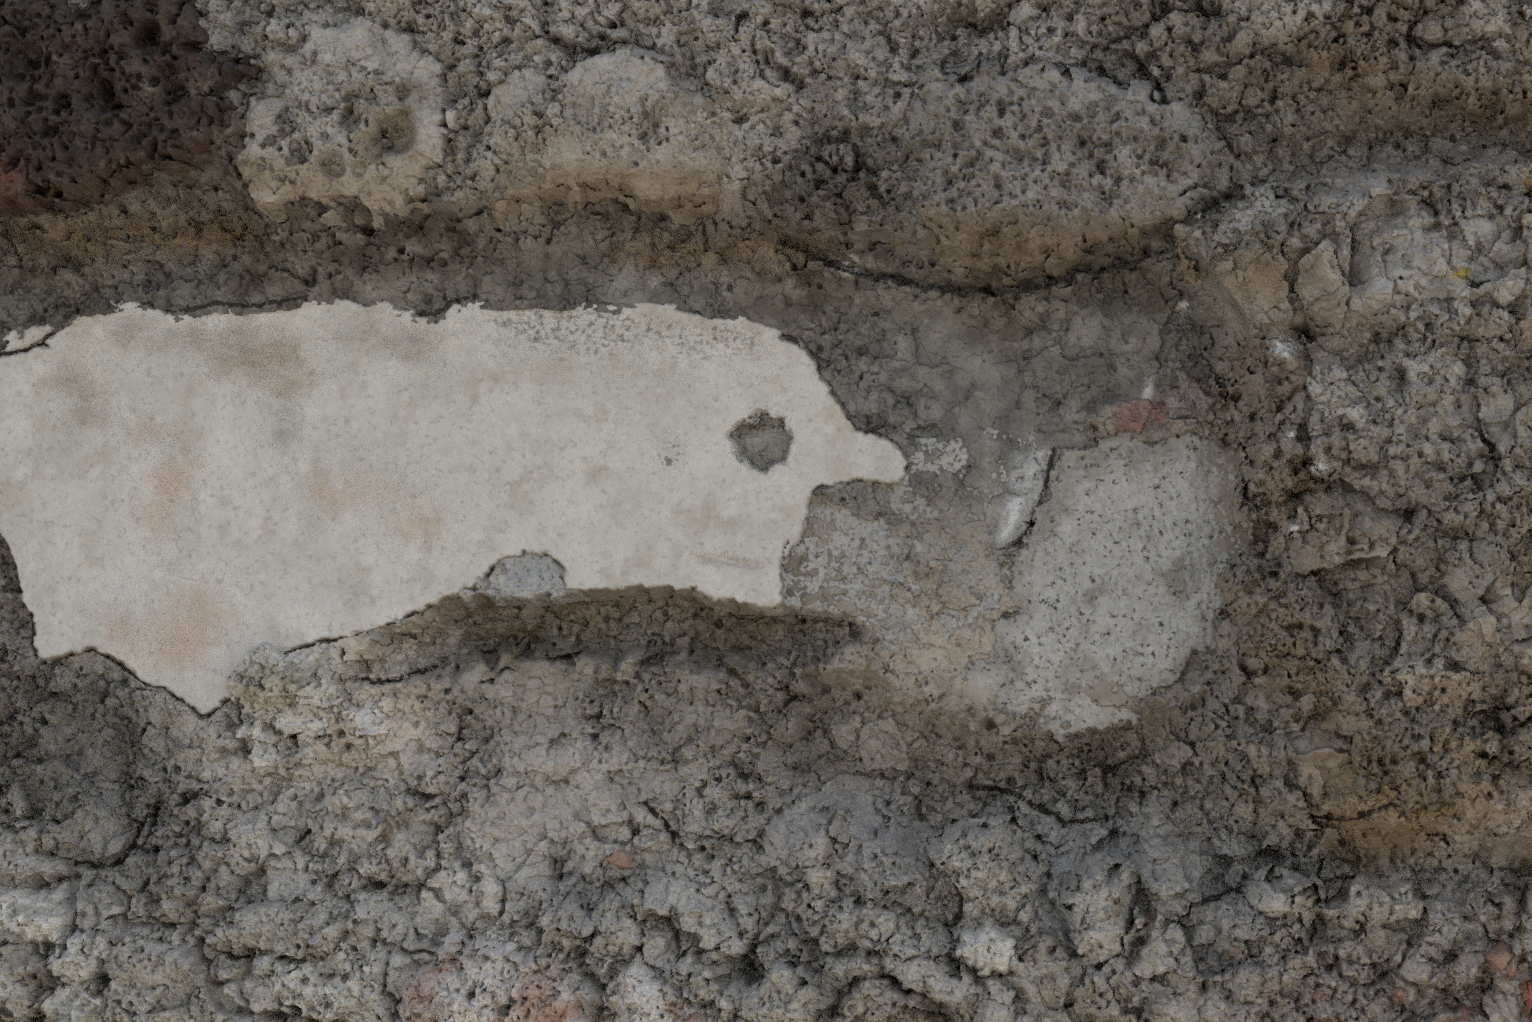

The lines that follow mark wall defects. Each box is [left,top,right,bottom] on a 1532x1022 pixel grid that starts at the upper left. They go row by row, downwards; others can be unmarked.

spalling [738,412,793,439]
crack [997,454,1052,550]
spalling [459,552,591,610]
crack [355,665,439,685]
crack [69,788,240,870]
crack [298,828,311,844]